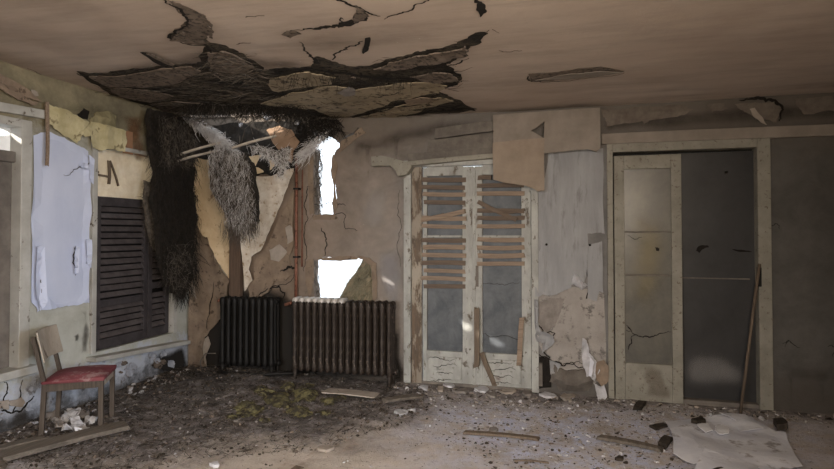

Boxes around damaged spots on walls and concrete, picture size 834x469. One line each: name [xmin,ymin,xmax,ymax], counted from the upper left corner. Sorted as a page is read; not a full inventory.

crack [474,0,487,17]
crack [281,0,429,64]
spalling [76,0,495,220]
peeling [601,105,693,127]
peeling [707,96,784,125]
peeling [247,190,295,300]
peeling [188,227,229,367]
spalling [305,255,377,301]
spalling [394,287,834,424]
crack [626,325,669,350]
crack [1,380,34,414]